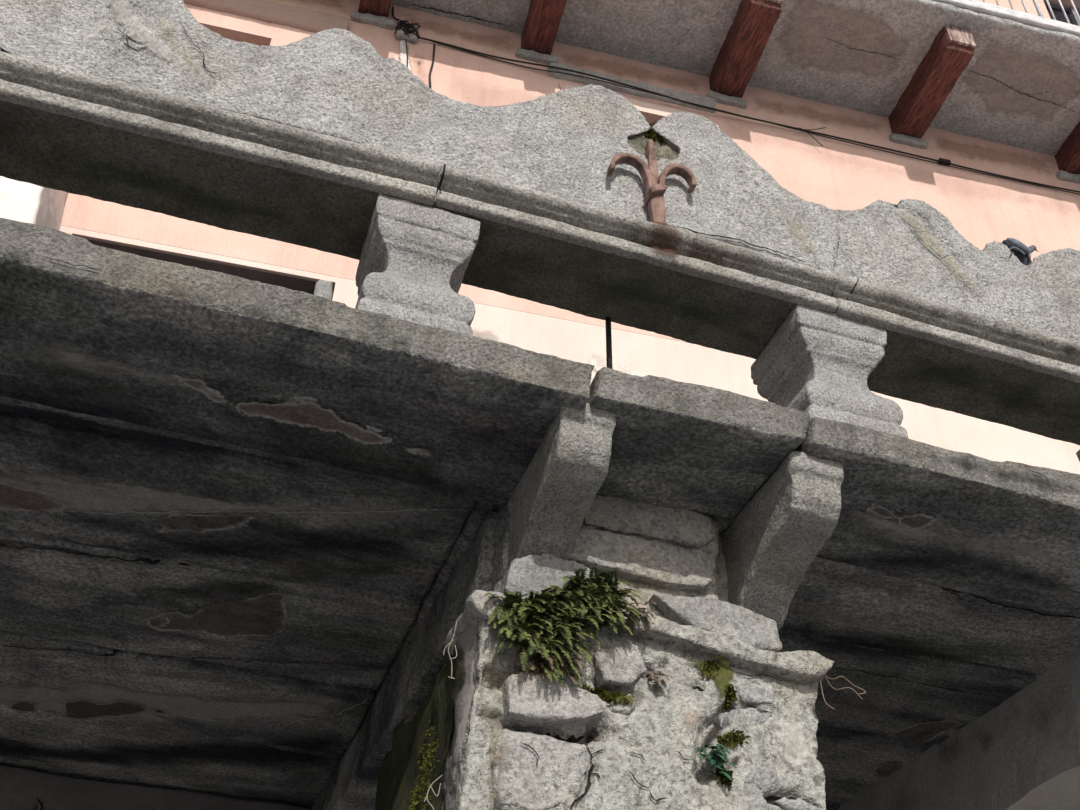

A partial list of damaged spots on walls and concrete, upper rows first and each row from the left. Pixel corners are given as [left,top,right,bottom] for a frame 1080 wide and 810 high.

peeling [394,39,412,72]
crack [820,35,907,61]
crack [965,69,1075,112]
rust [646,223,681,262]
peeling [474,332,496,341]
peeling [172,374,392,445]
peeling [406,448,432,457]
peeling [156,512,253,533]
crack [938,586,1080,619]
spalling [8,701,38,714]
spalling [62,700,171,719]